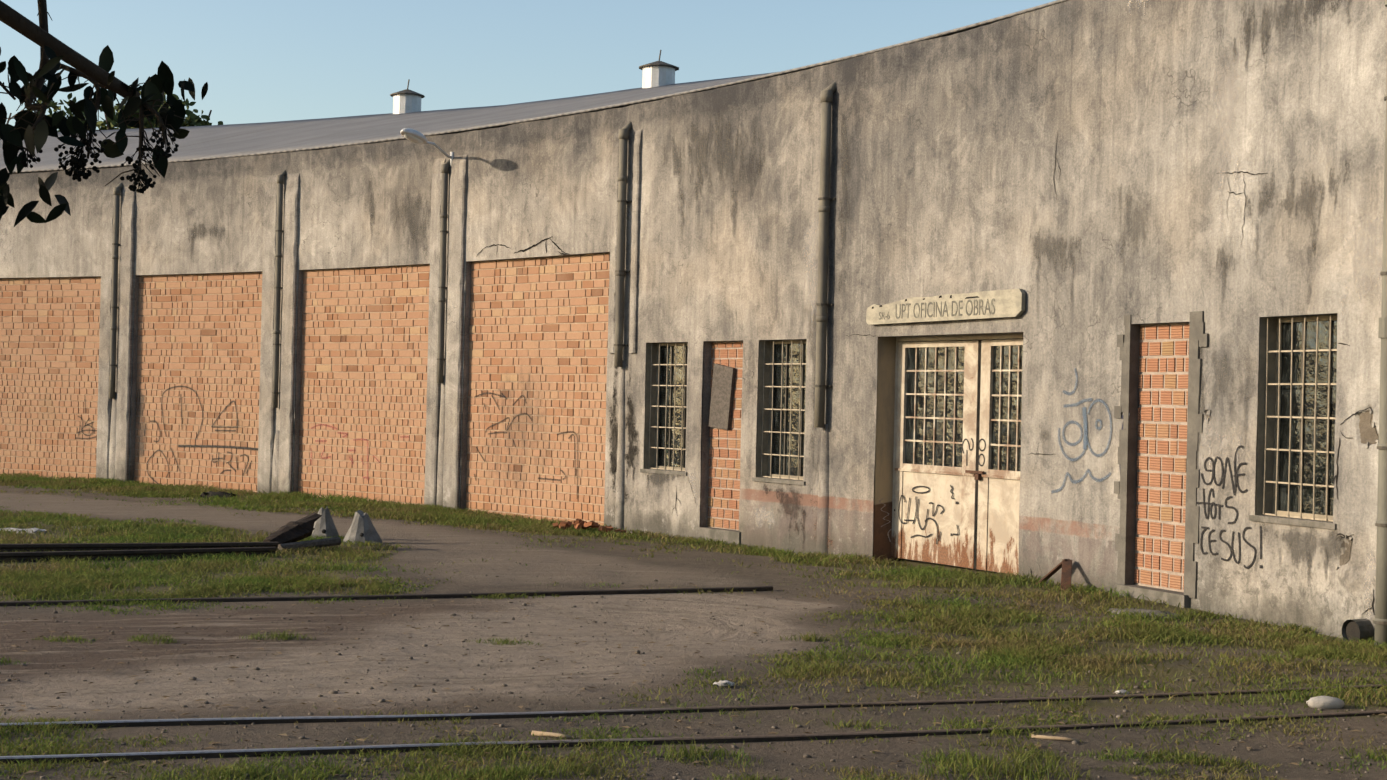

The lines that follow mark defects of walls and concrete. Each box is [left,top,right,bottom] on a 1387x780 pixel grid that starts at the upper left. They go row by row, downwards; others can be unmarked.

water stain [1233,0,1339,55]
water stain [1248,163,1347,250]
flaking render [1354,407,1379,448]